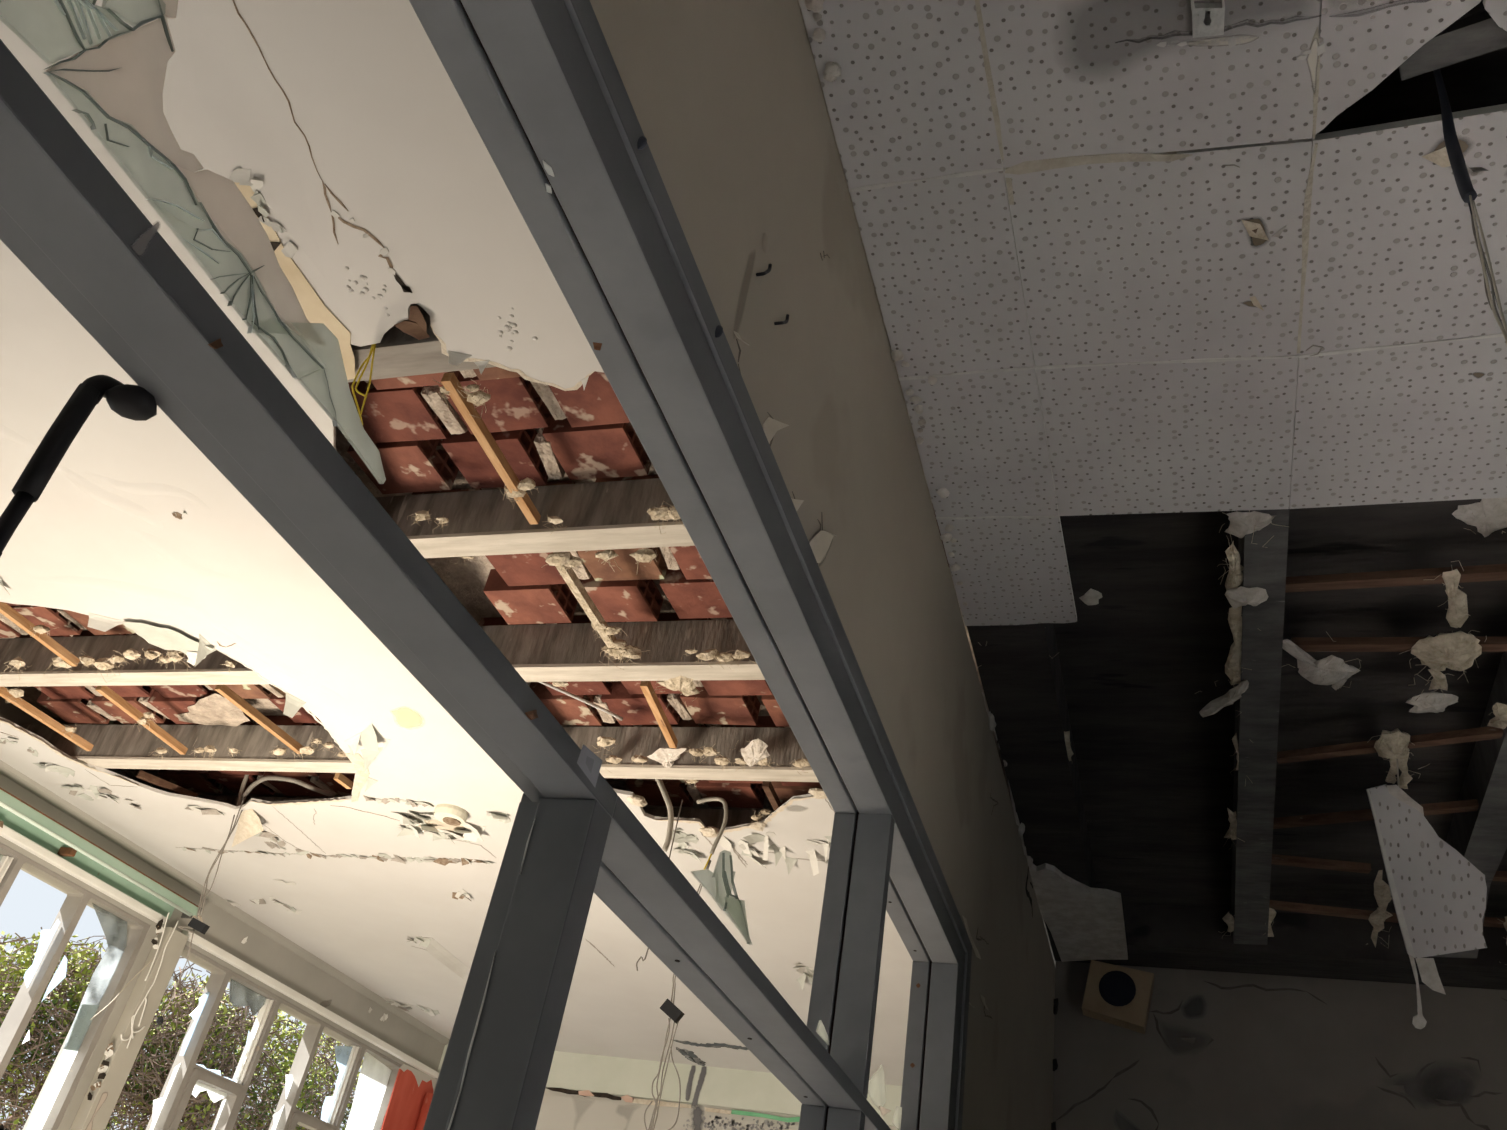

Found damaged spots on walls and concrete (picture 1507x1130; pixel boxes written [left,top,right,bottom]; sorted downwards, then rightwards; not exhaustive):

crack [232,0,430,340]
peeling [543,160,554,194]
flaking render [228,168,355,380]
flaking render [430,325,594,391]
peeling [88,613,127,632]
peeling [0,720,142,810]
crack [313,805,399,824]
peeling [626,788,832,876]
flaking render [982,692,1033,868]
spalling [1366,759,1487,1029]